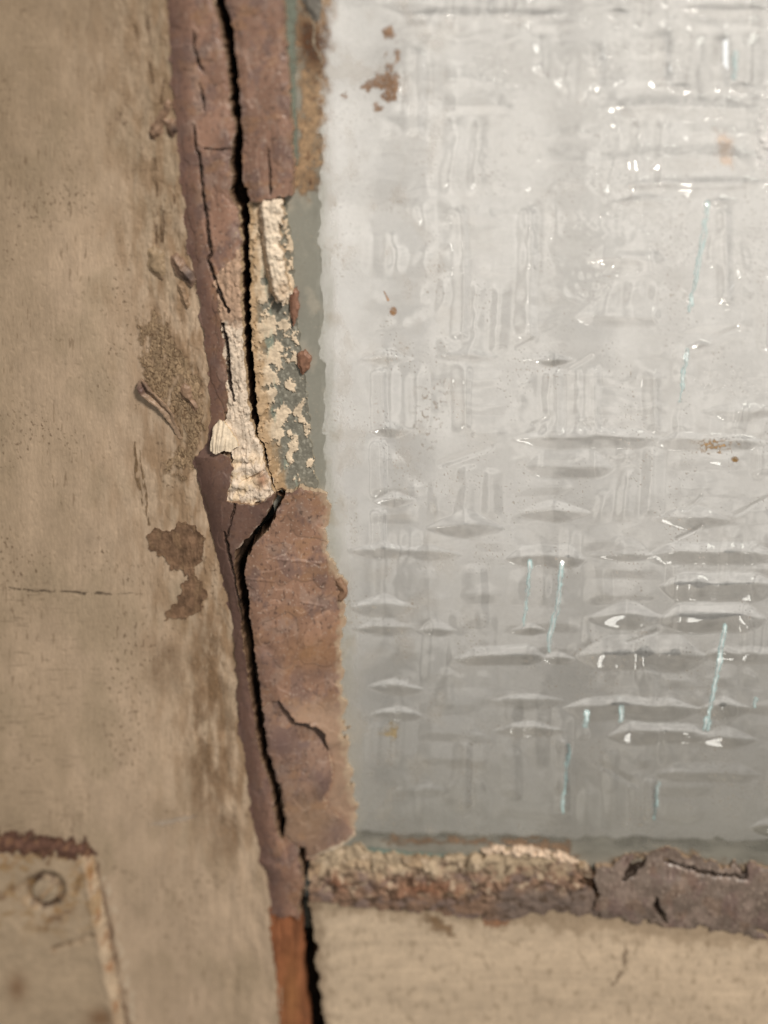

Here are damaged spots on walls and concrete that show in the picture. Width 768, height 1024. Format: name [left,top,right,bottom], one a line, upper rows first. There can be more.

corrosion [360,25,401,112]
corrosion [294,0,333,195]
crack [193,0,272,463]
peeling [289,287,300,327]
peeling [297,349,312,375]
peeling [210,419,239,454]
crack [224,488,326,1024]
corrosion [0,830,98,860]
crack [622,857,748,881]
crack [653,898,667,923]